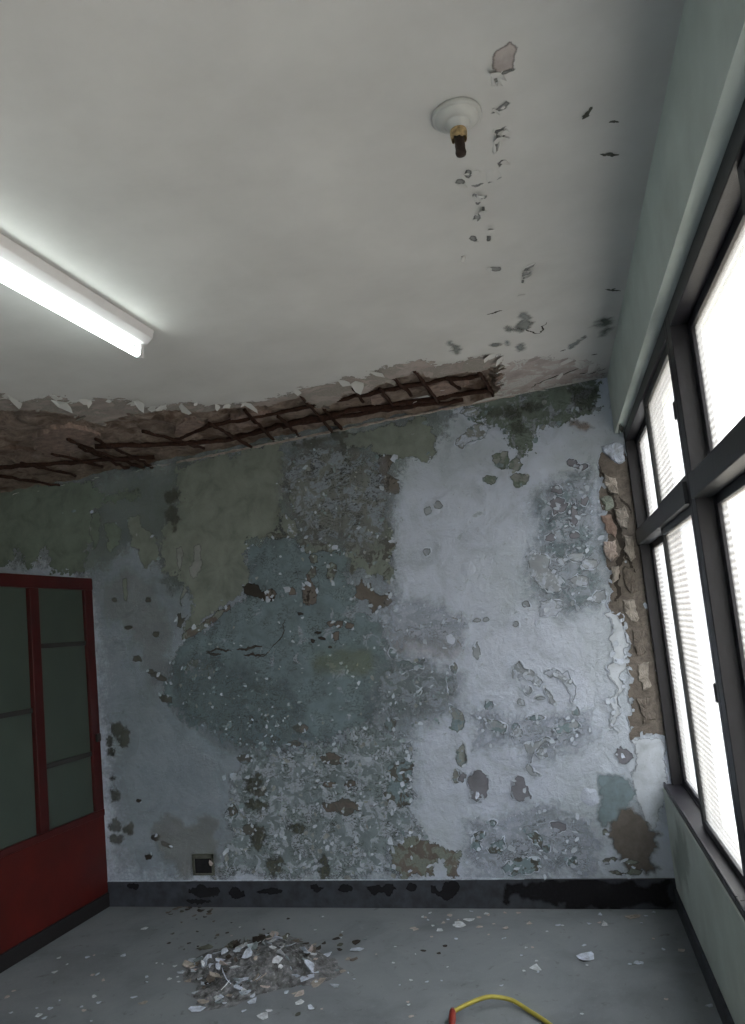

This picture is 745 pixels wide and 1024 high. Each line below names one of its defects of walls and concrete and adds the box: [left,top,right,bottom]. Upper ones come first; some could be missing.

peeling [491,42,517,87]
peeling [492,127,510,167]
peeling [456,170,487,222]
damp [462,379,604,459]
flaking render [0,354,665,905]
damp [503,774,673,909]